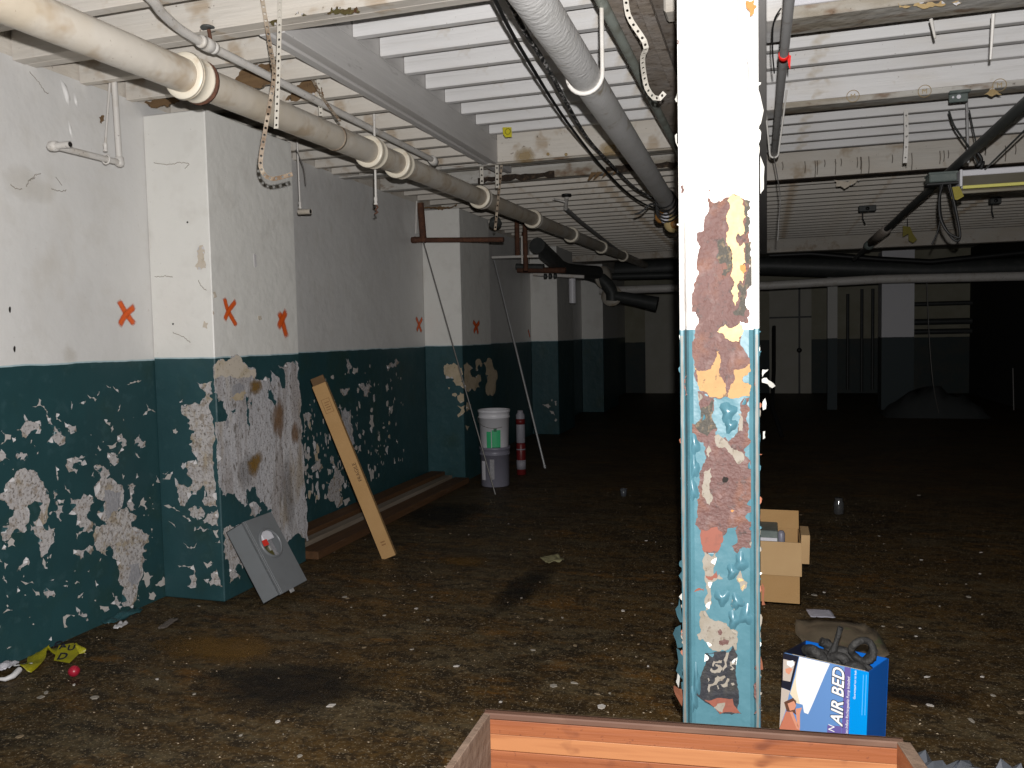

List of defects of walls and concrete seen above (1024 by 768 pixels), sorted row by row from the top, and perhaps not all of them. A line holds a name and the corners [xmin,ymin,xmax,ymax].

rust [515,263,566,273]
peeling [0,354,350,628]
peeling [331,359,404,481]
peeling [444,358,498,430]
peeling [673,190,775,728]